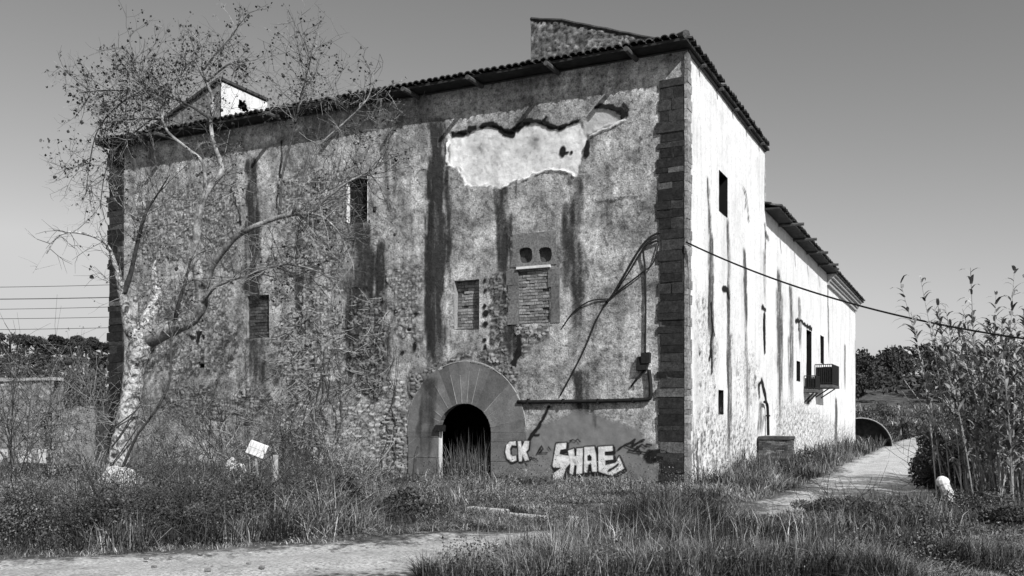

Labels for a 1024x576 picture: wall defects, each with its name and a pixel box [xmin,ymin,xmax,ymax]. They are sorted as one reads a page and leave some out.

water stain [244,158,263,301]
flaking render [130,161,549,477]
water stain [425,119,453,363]
water stain [493,182,517,360]
flaking render [445,109,626,189]
water stain [563,177,585,325]
water stain [743,249,764,429]
water stain [777,271,802,411]